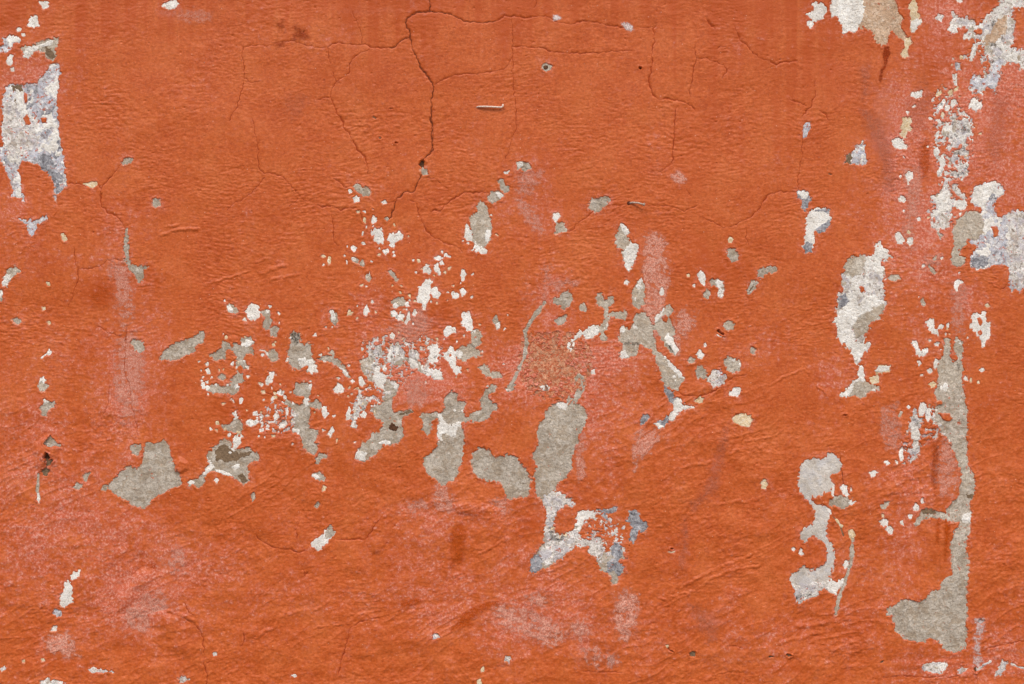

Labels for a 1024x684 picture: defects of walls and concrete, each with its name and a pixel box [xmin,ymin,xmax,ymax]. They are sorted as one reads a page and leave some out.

spalling [0,1,67,202]
spalling [101,223,741,584]
spalling [462,161,531,254]
crack [227,0,828,249]
spalling [797,190,832,254]
spalling [789,453,856,604]
spalling [805,0,922,58]
spalling [832,230,913,399]
spalling [869,303,991,653]
spalling [891,0,1024,294]